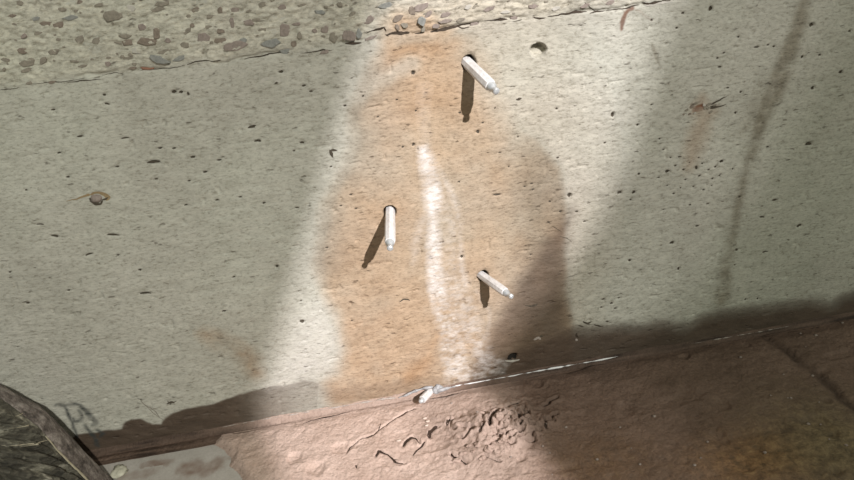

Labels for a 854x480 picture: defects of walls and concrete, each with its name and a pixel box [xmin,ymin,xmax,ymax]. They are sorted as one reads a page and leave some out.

crack [245,0,672,59]
crack [1,72,122,90]
corrosion [678,89,726,177]
leakage [261,0,854,395]
crack [347,409,450,469]
crack [479,403,547,432]